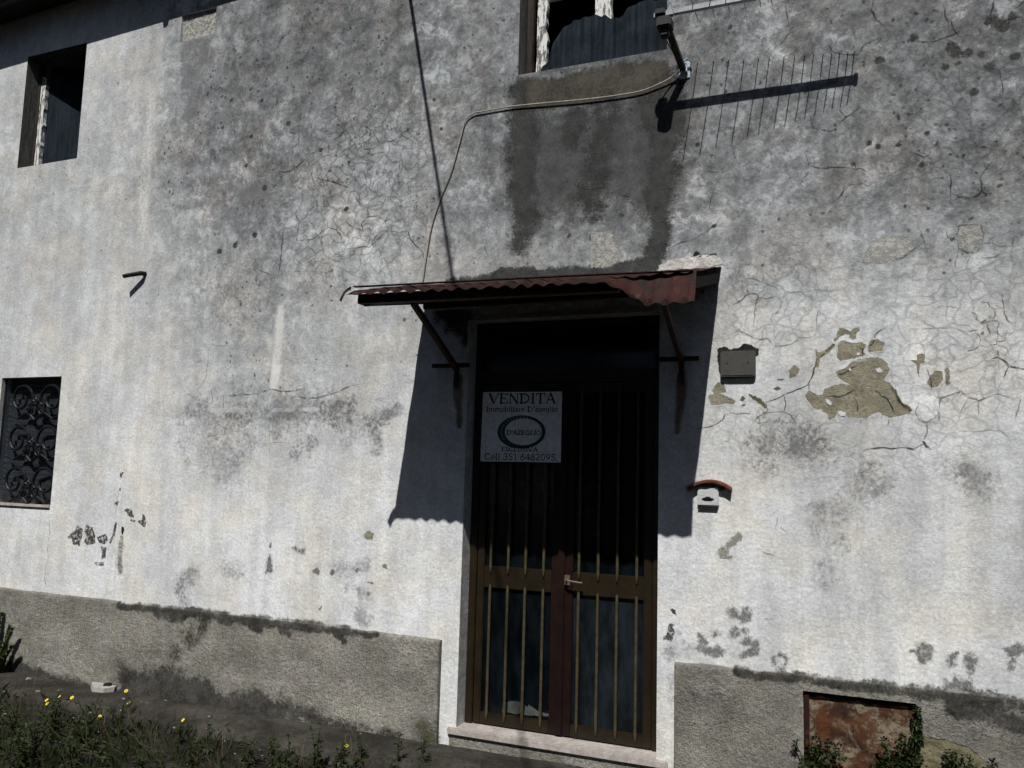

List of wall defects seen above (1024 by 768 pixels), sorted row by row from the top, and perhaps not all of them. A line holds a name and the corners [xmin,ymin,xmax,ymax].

crack [258,114,424,274]
leakage [445,60,700,289]
crack [804,155,867,200]
crack [950,164,990,203]
peeling [705,343,767,410]
crack [697,344,834,429]
peeling [773,327,950,425]
crack [961,301,1024,376]
crack [863,441,928,451]
peeling [67,472,146,566]
leakage [116,601,397,737]
leakage [732,665,1024,734]